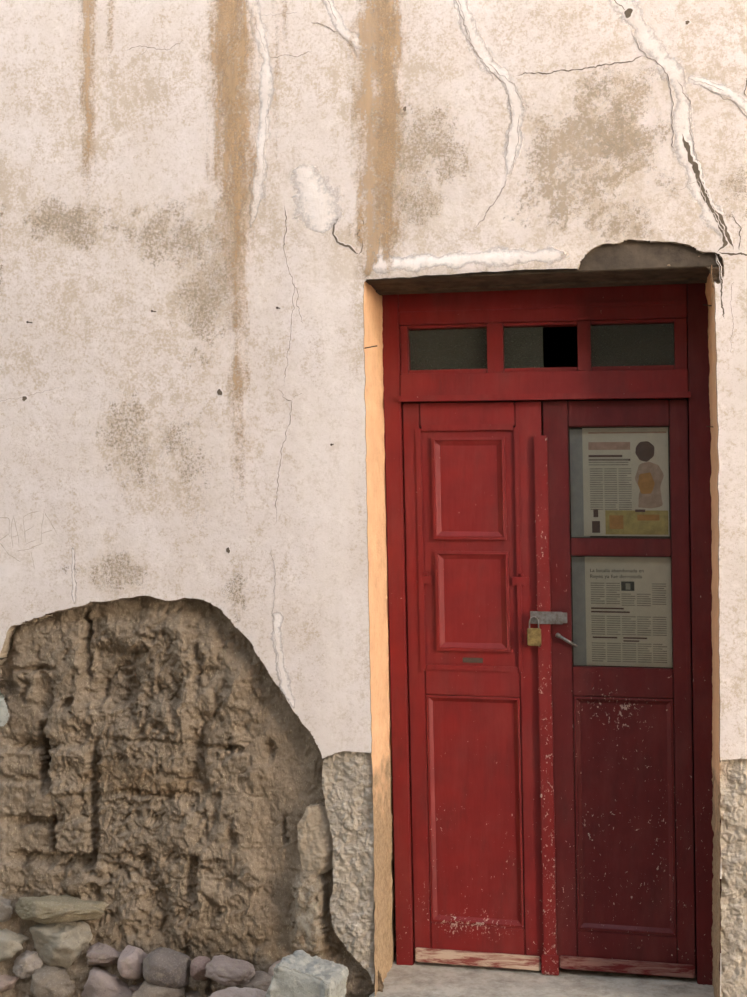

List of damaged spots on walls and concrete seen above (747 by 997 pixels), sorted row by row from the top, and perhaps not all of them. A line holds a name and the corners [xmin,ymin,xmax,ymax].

damp [23,0,258,405]
crack [247,0,372,518]
damp [349,0,468,277]
crack [454,0,747,352]
spalling [577,239,724,289]
spalling [0,596,384,997]
crack [271,549,295,708]